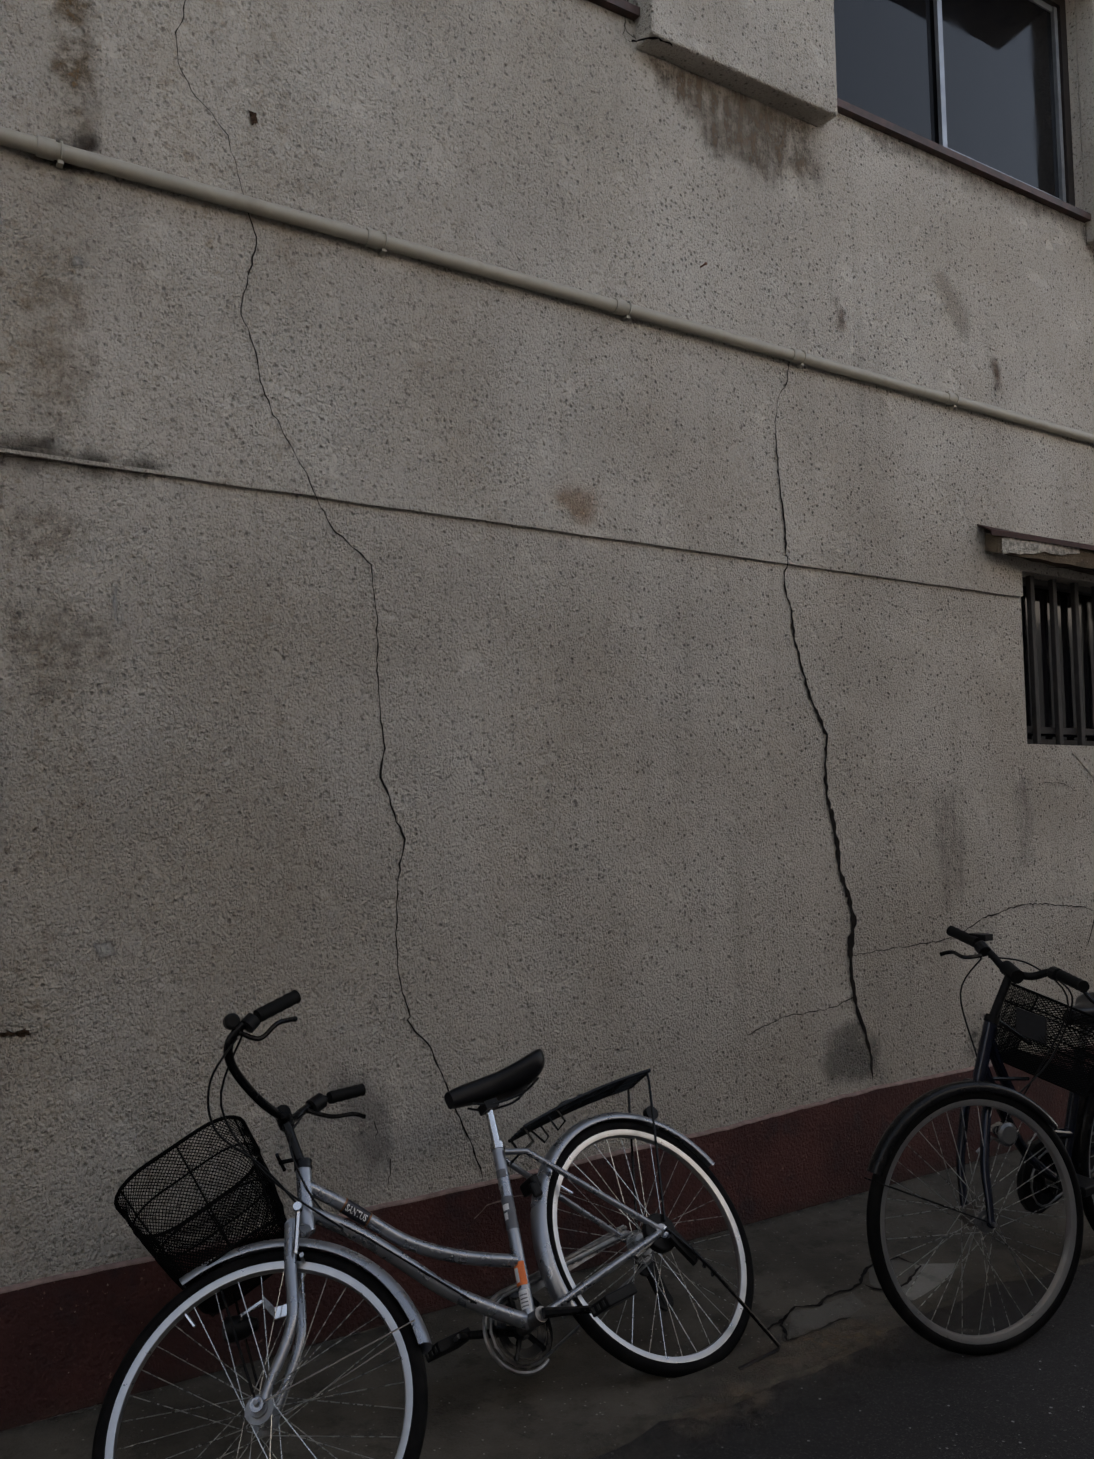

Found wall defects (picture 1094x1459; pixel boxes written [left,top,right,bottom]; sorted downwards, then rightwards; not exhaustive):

corrosion [53,0,90,125]
crack [175,0,483,1178]
crack [748,362,1094,1088]